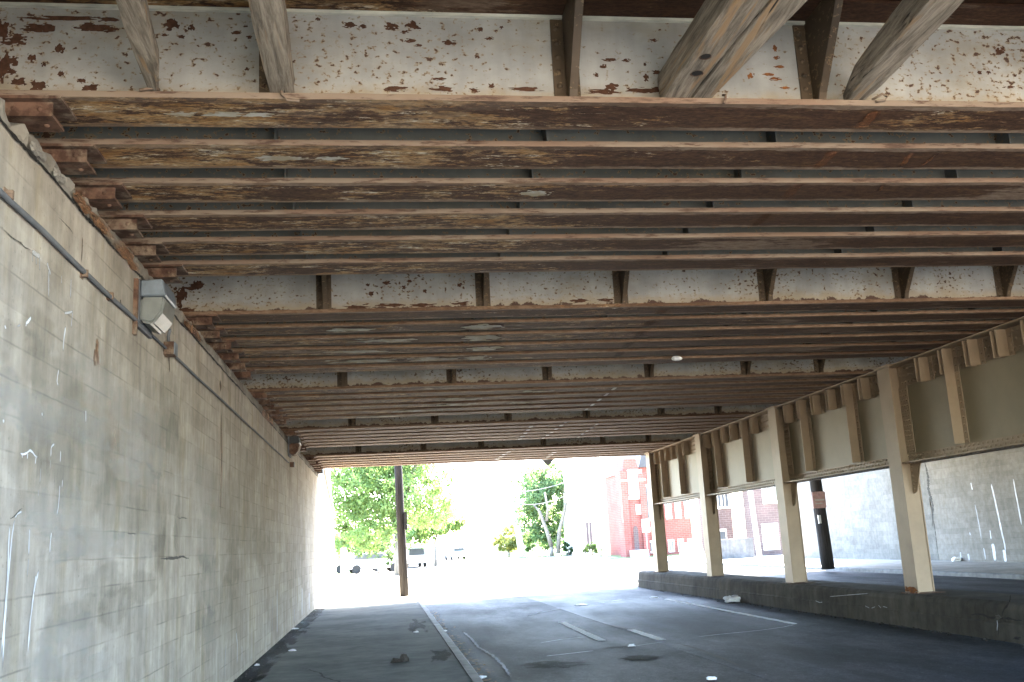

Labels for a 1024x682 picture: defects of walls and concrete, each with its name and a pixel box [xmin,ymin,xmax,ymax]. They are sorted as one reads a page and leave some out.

peeling [384,20,422,47]
peeling [429,77,452,92]
peeling [589,58,660,94]
crack [925,464,939,558]